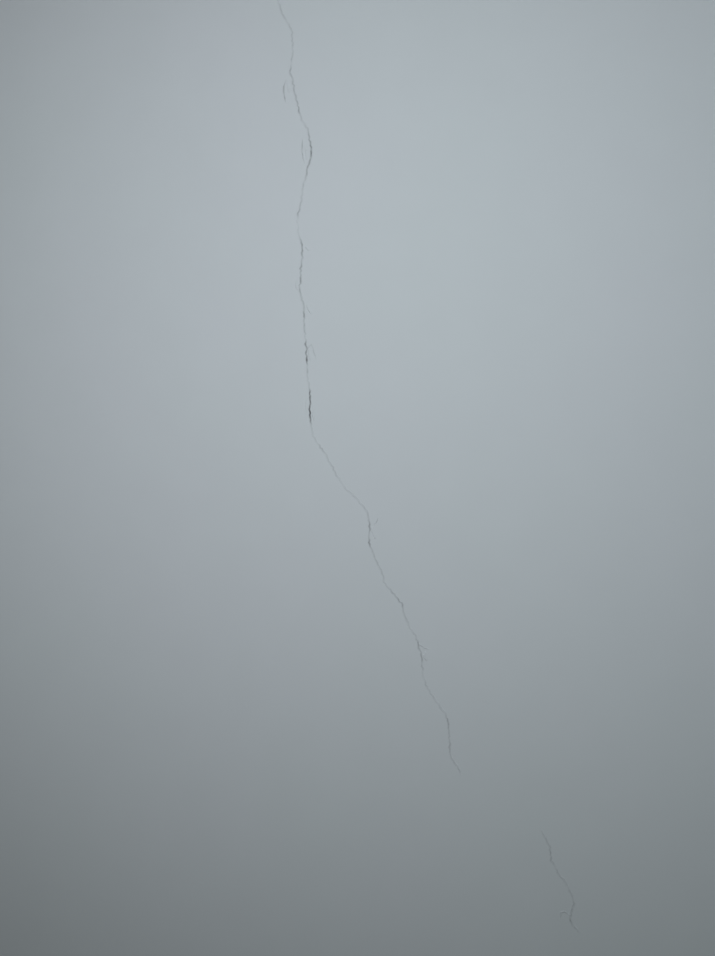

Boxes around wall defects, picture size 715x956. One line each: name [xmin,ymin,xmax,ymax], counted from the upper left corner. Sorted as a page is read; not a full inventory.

crack [277,0,461,774]